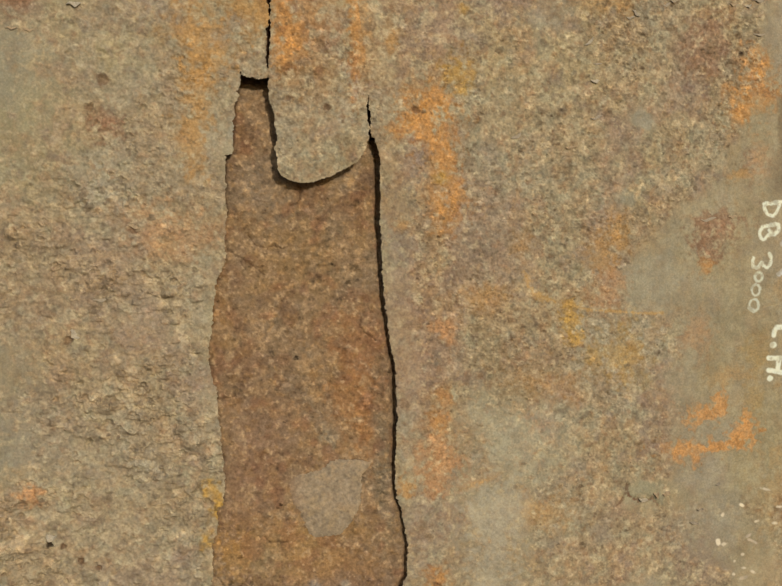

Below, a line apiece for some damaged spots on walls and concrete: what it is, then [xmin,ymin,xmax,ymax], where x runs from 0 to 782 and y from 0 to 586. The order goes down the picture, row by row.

crack [264,0,272,68]
rust [335,0,486,251]
rust [662,0,782,138]
spalling [208,0,408,586]
rust [525,479,593,552]
rust [485,194,667,418]
rust [639,267,782,550]
rust [671,195,767,282]